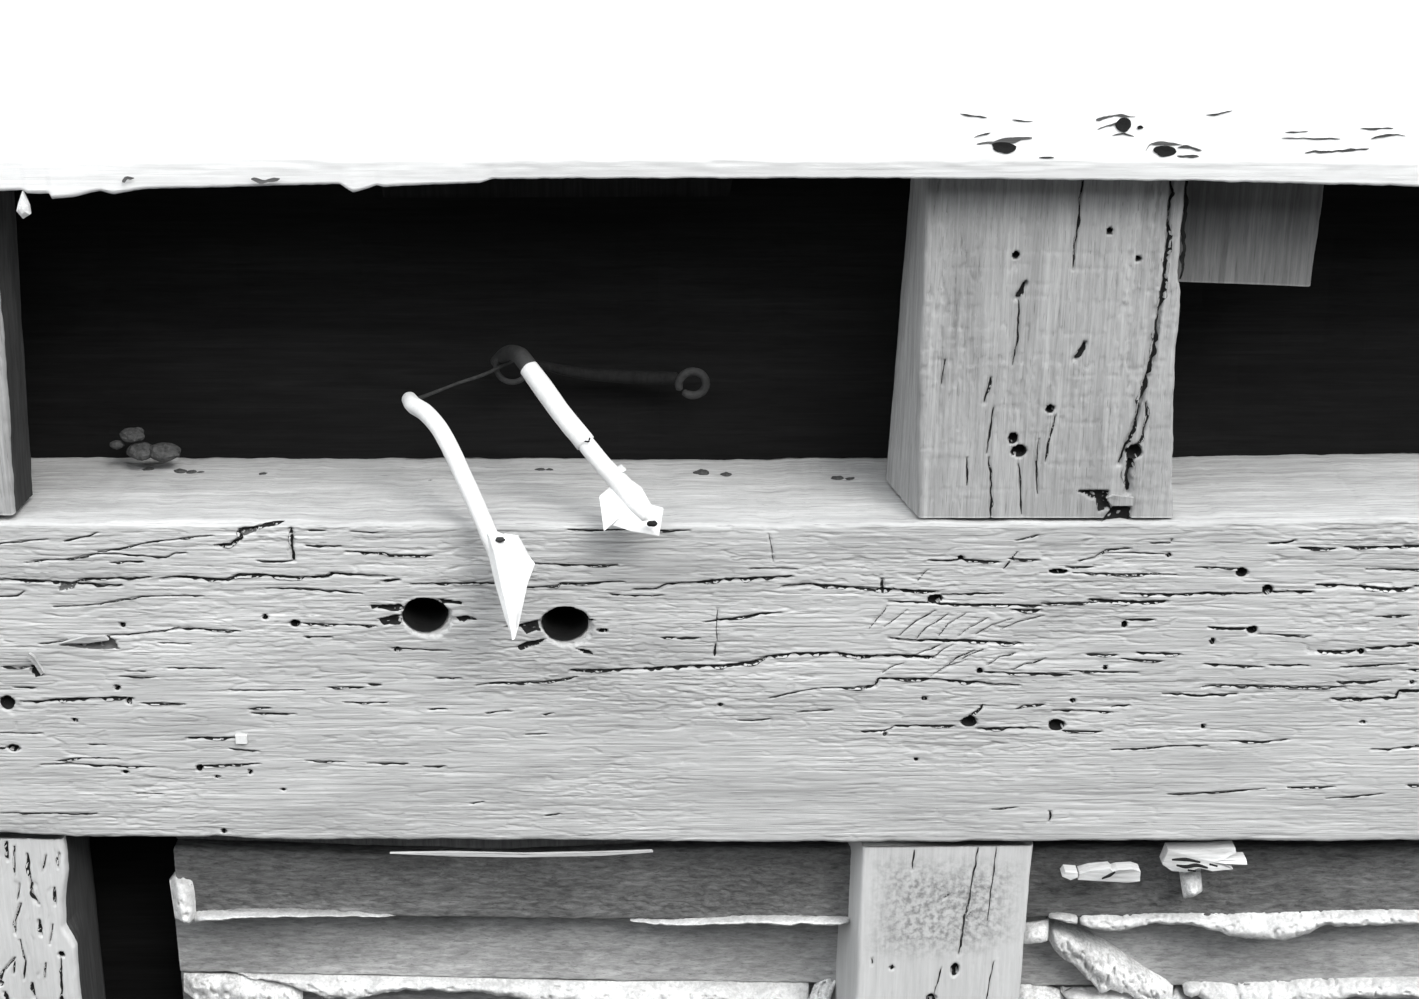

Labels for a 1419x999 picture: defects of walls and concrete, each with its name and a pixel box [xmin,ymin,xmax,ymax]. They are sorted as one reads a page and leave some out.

crack [1096,114,1202,490]
crack [0,282,1419,794]
crack [0,813,98,999]
crack [934,847,997,994]
crack [991,807,1052,821]
crack [1169,784,1419,799]